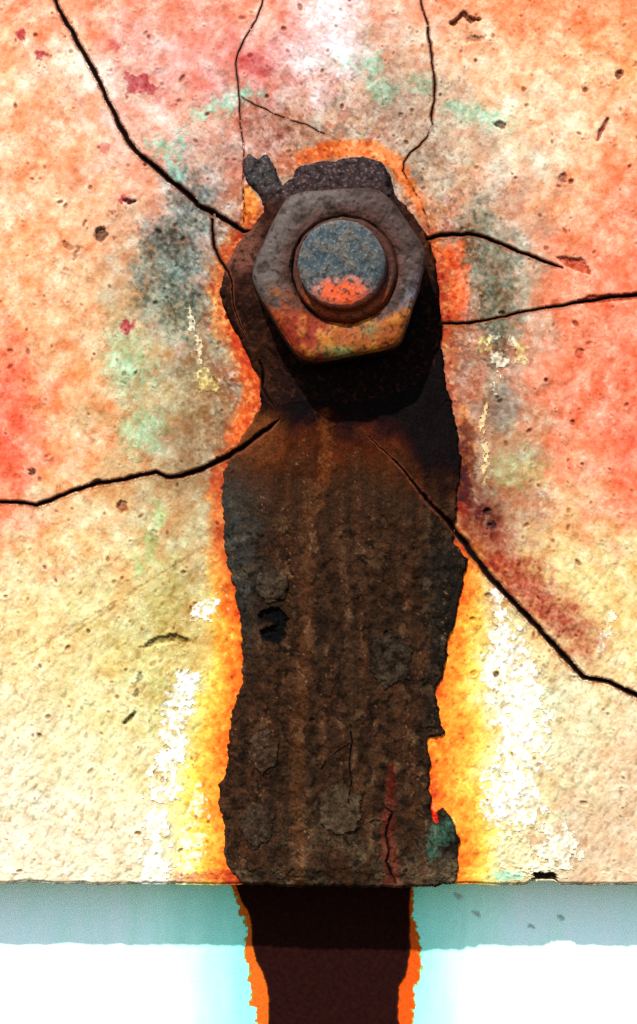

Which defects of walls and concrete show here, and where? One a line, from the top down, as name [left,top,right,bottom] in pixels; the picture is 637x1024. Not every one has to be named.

crack [0,0,340,509]
crack [401,0,563,269]
crack [438,291,637,327]
water stain [90,50,325,1024]
corrosion [164,136,615,1024]
crack [361,428,637,700]
water stain [412,588,584,1024]